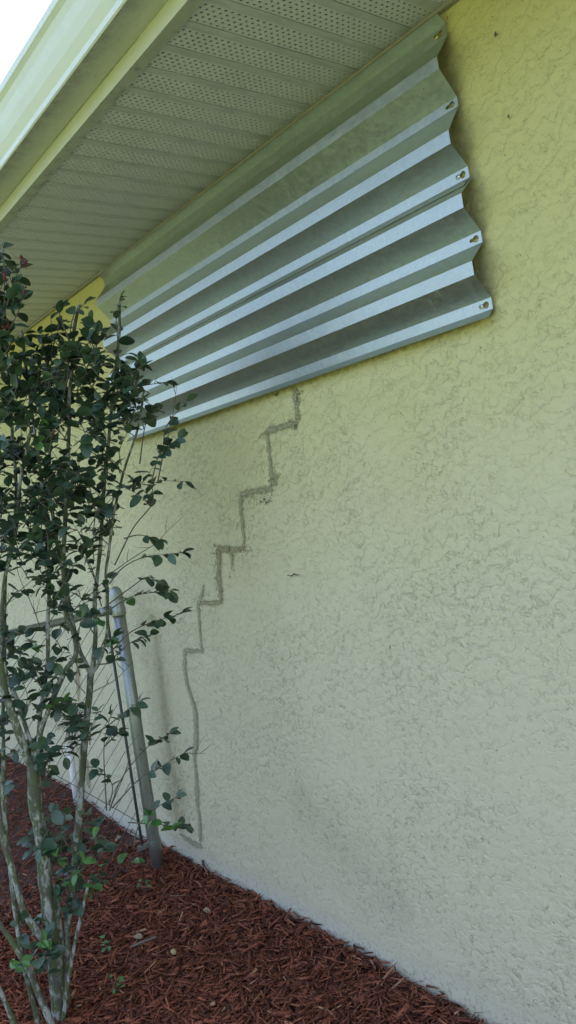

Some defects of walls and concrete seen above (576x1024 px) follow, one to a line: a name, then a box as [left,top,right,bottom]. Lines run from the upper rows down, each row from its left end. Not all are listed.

crack [179,387,303,848]